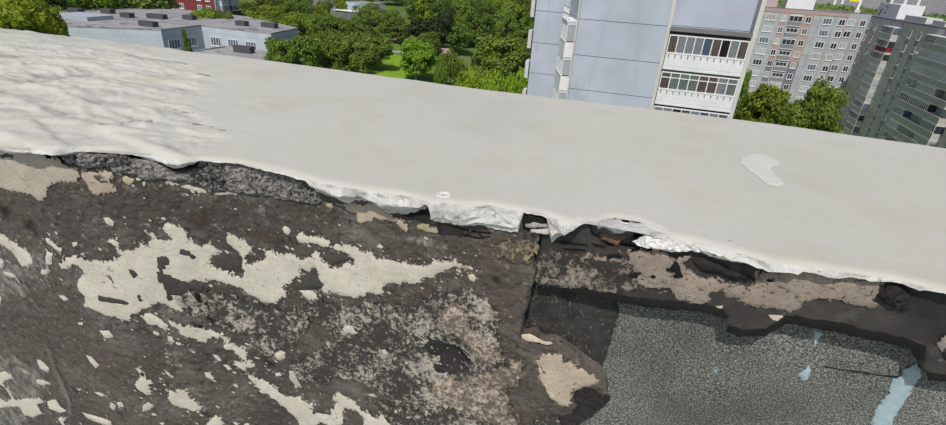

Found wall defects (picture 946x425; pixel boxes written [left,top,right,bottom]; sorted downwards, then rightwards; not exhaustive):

spalling [0,152,439,247]
peeling [0,215,600,425]
peeling [490,214,885,321]